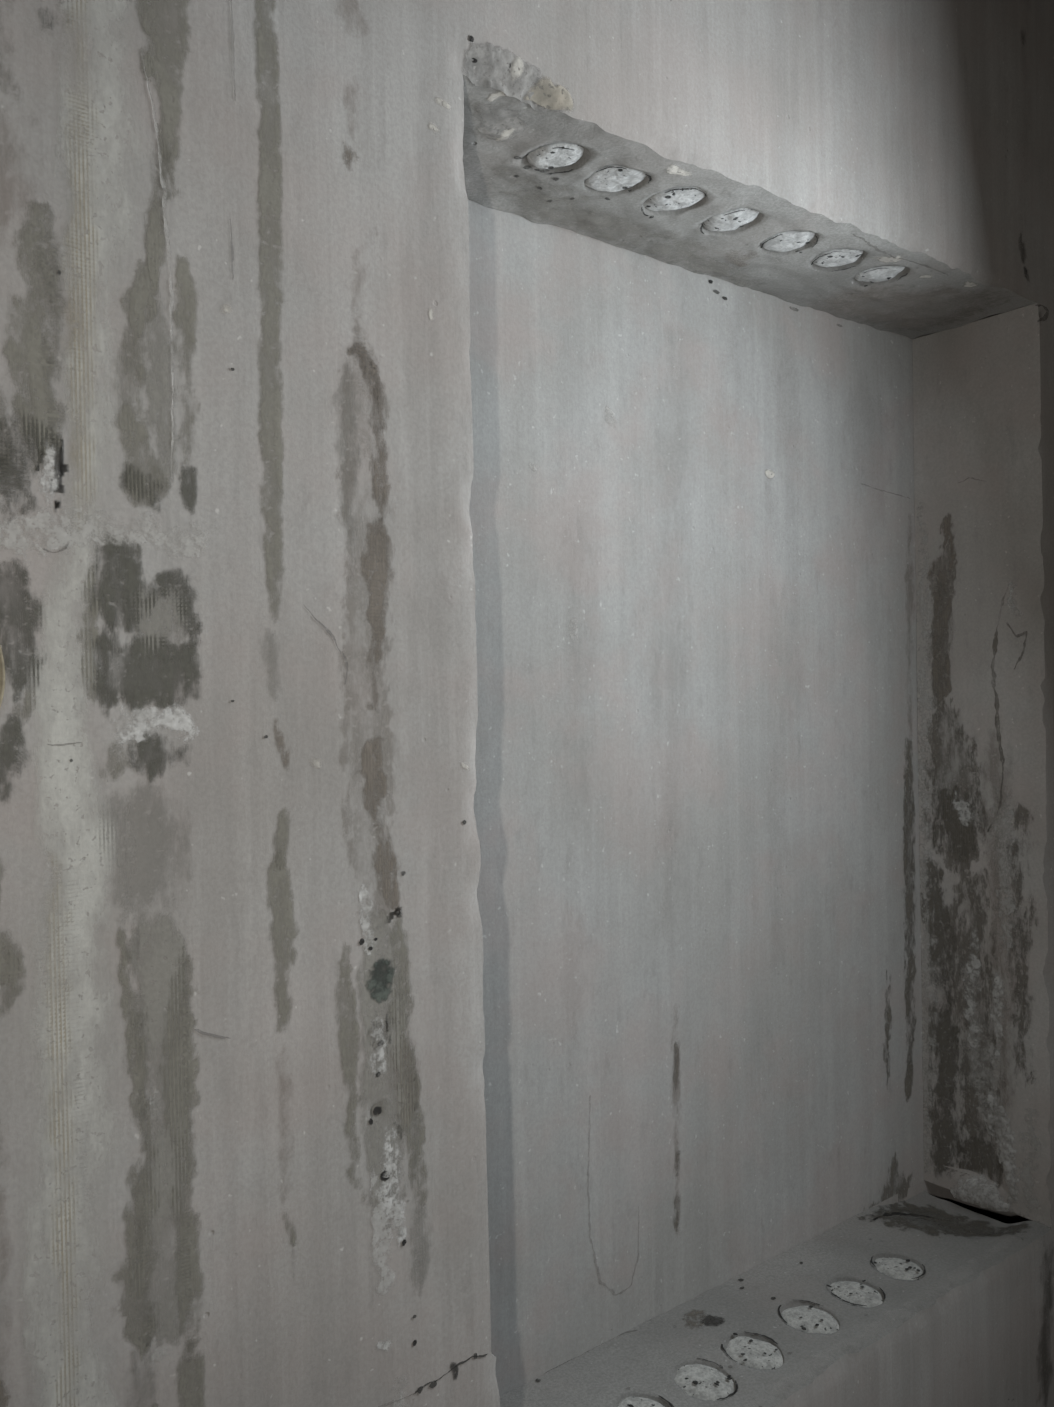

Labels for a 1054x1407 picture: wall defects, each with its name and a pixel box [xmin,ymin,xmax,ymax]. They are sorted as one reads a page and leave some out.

leakage [870,508,1041,1208]
crack [415,1353,487,1394]